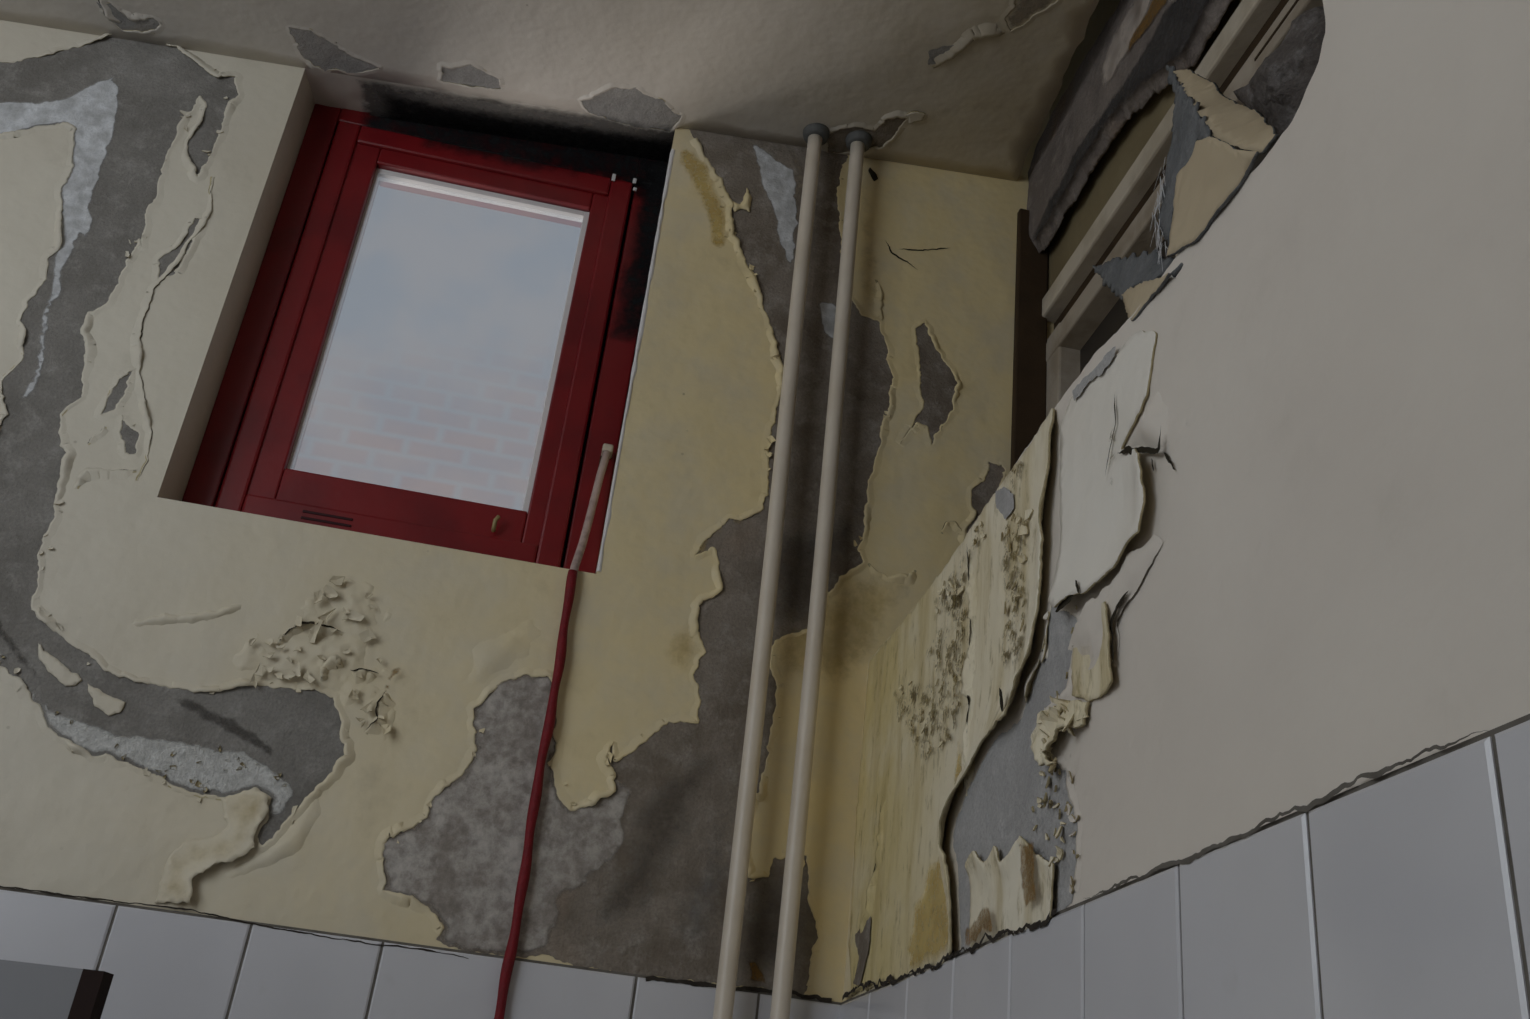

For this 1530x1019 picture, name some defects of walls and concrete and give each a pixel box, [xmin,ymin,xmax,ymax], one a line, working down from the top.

peeling [285,25,383,75]
peeling [436,60,505,92]
peeling [577,83,686,132]
flaking render [821,110,909,181]
peeling [928,0,1064,68]
peeling [895,318,963,451]
flaking render [0,0,356,904]
leakage [374,129,899,996]
peeling [848,408,1163,996]
crack [1085,730,1487,899]